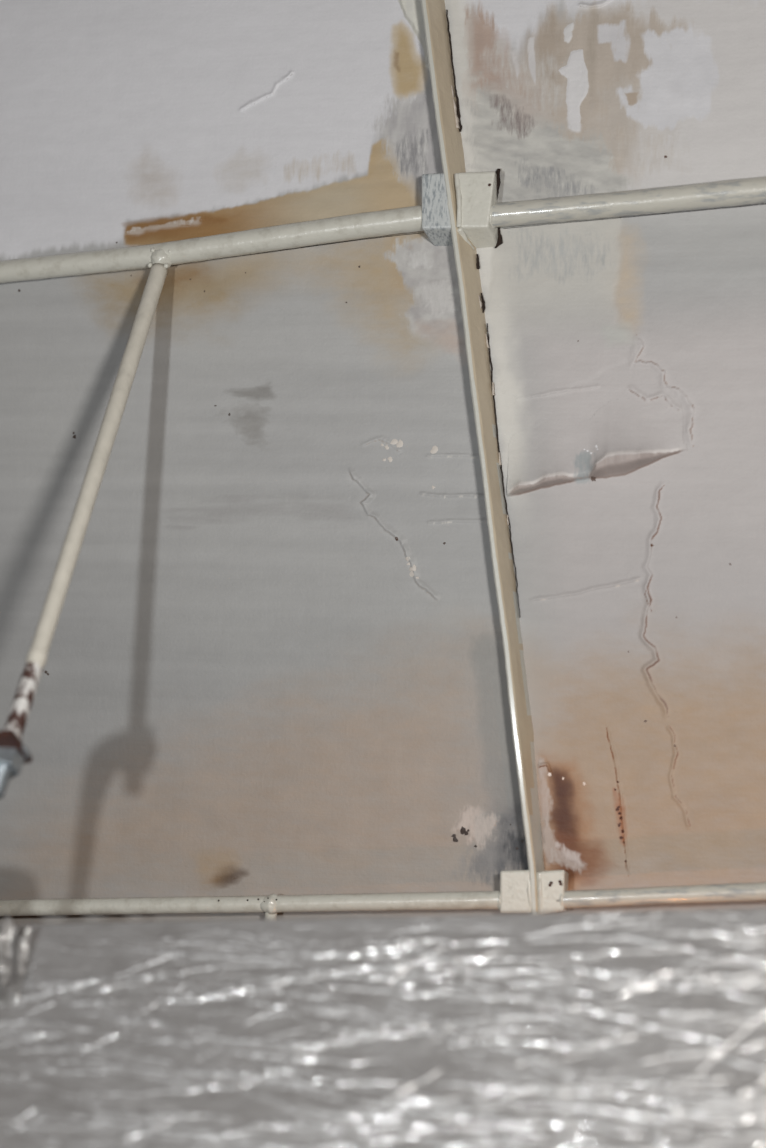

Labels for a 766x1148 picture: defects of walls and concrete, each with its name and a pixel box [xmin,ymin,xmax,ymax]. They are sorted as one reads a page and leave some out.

flaking render [395,0,430,75]
peeling [452,0,700,189]
damp [211,231,452,394]
damp [0,591,501,900]
damp [518,604,552,741]
corrosion [534,739,627,891]
crack [637,479,695,831]
damp [0,909,501,925]